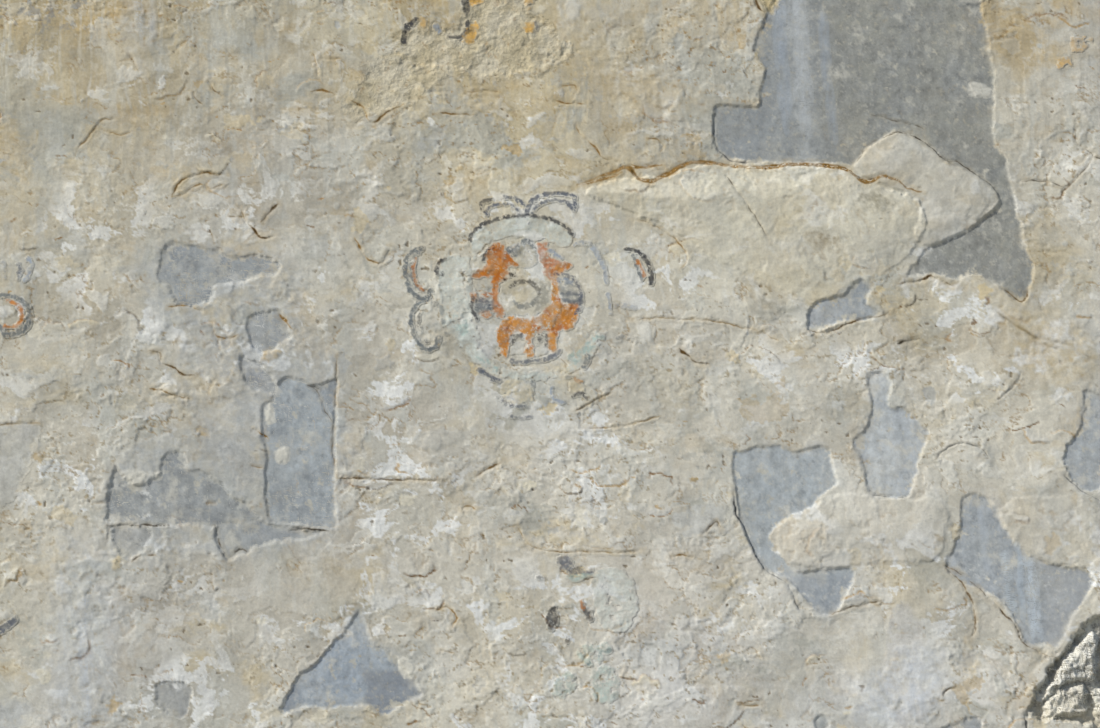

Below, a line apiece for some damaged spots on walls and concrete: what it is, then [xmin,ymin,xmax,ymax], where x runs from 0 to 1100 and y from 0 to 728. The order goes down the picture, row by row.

peeling [149,237,282,308]
crack [627,217,693,274]
crack [546,79,1100,247]
peeling [708,0,1035,302]
peeling [102,307,343,569]
peeling [670,366,931,624]
peeling [1061,384,1100,493]
peeling [279,602,428,721]
peeling [940,492,1100,728]